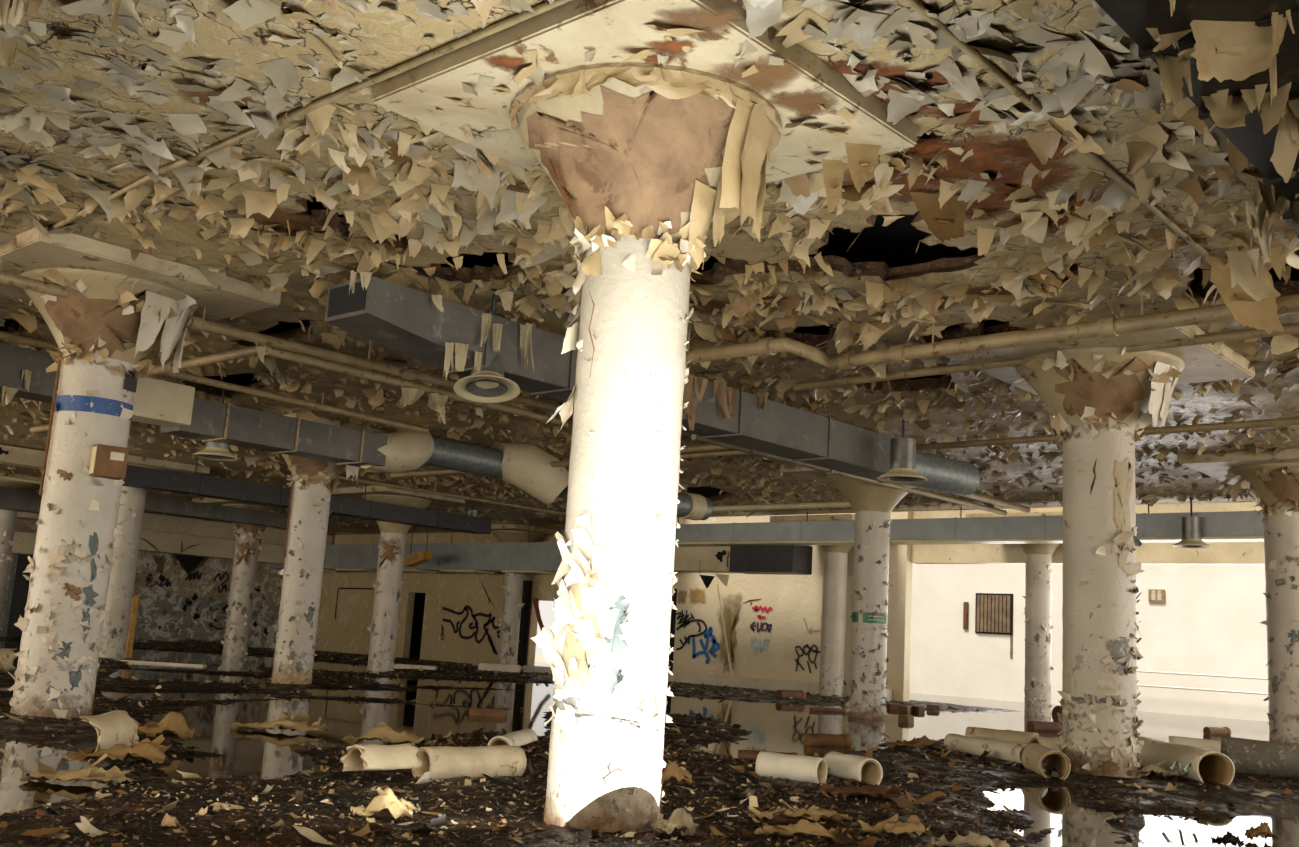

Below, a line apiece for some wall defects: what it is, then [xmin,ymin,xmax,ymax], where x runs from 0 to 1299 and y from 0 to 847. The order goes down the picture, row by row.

leakage [661,8,736,37]
leakage [718,62,833,116]
peeling [0,0,1299,603]
peeling [0,463,320,719]
peeling [119,391,674,737]
peeling [845,520,892,713]
peeling [1022,562,1054,670]
peeling [1024,612,1145,776]
peeling [1261,620,1299,734]